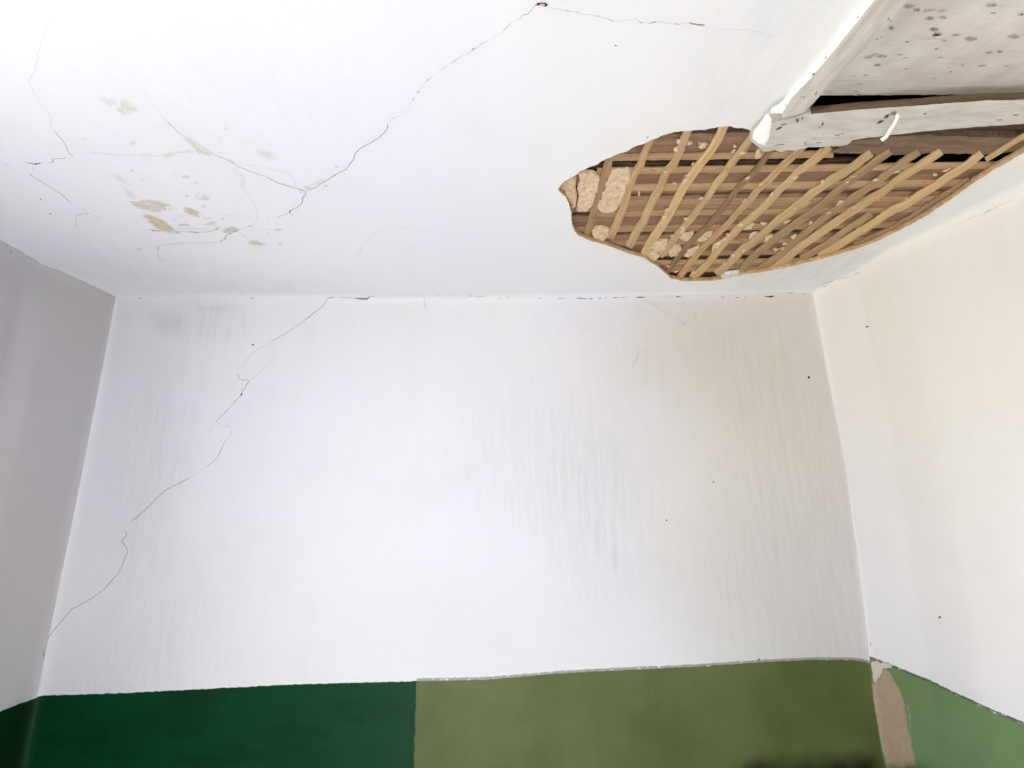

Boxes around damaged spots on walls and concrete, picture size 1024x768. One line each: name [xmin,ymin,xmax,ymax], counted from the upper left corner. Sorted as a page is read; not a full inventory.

damp [82,127,340,258]
crack [3,6,765,261]
spalling [558,100,1024,281]
crack [36,297,369,698]
peeling [871,660,918,768]